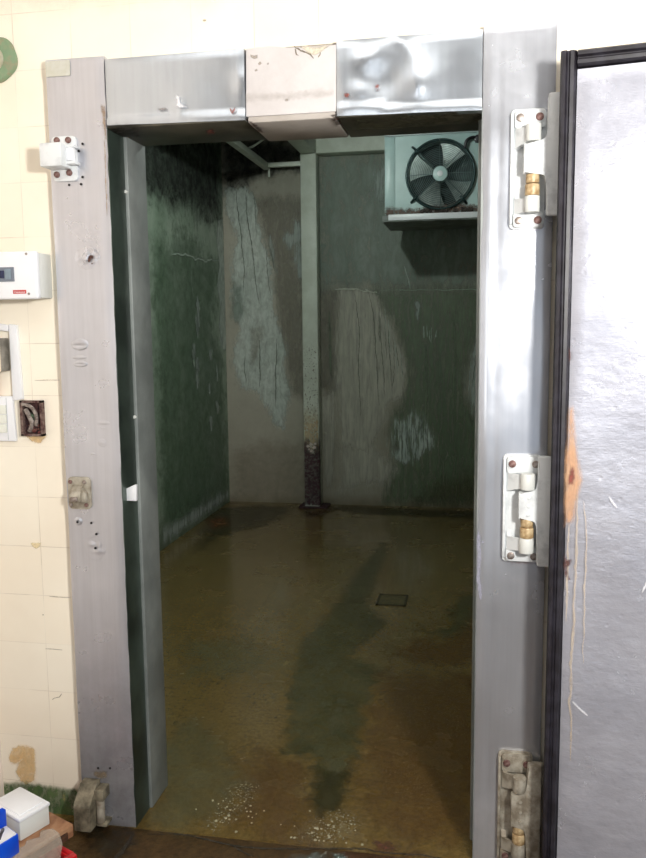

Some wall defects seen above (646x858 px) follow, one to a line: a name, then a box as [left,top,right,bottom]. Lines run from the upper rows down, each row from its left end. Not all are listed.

flaking render [246,45,349,141]
leakage [145,140,302,429]
corrosion [303,349,321,506]
leakage [319,154,477,505]
corrosion [564,413,587,668]
peeling [9,747,35,784]
leakage [282,543,387,811]